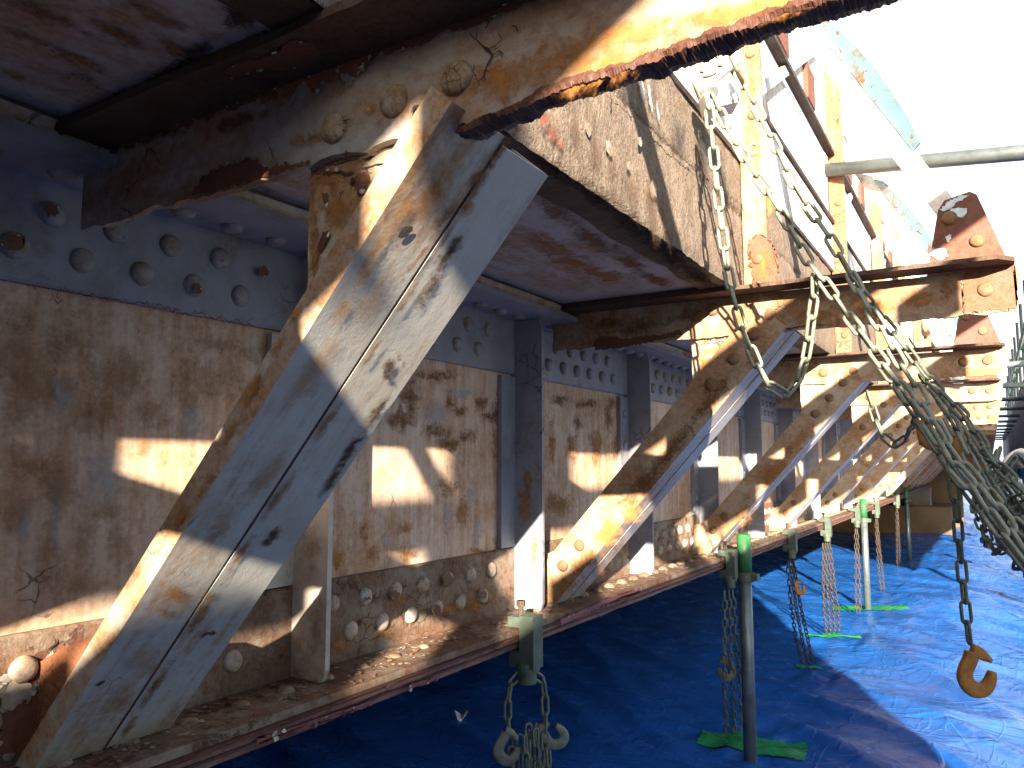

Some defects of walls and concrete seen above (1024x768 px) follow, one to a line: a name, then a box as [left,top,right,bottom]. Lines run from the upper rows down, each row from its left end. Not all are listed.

crack [470,18,518,86]
peeling [185,155,370,196]
rust [398,0,903,311]
peeling [940,195,968,218]
peeling [313,230,330,267]
peeling [929,234,951,260]
rust [383,356,401,379]
rust [368,372,453,431]
rust [697,379,728,415]
rust [549,396,618,464]
rust [326,439,361,491]
rust [565,426,694,587]